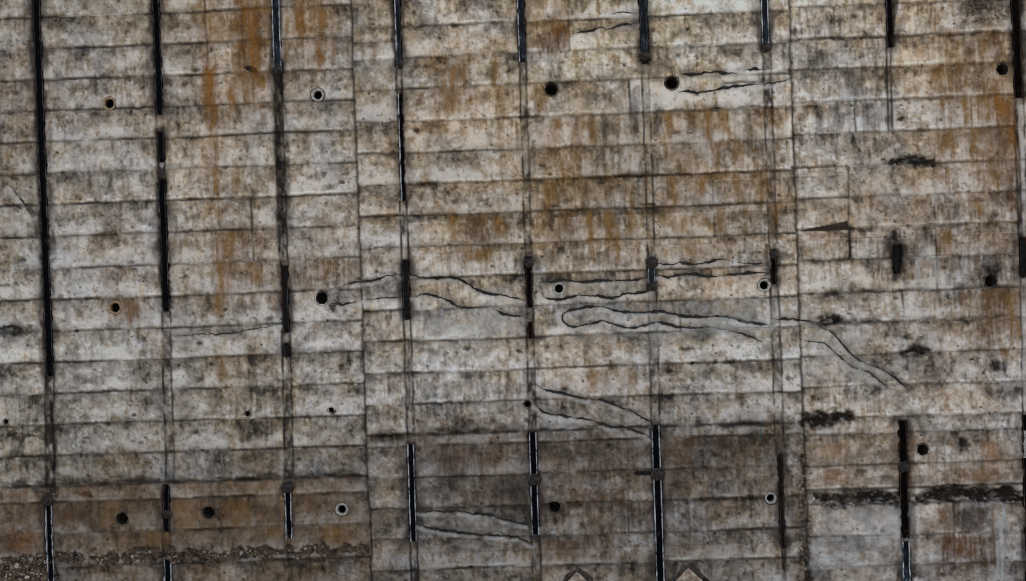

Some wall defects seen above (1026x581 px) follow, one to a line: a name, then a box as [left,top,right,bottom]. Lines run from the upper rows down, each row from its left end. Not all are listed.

corrosion [228,2,270,102]
corrosion [203,67,218,126]
corrosion [935,33,1016,209]
crack [329,259,906,388]
crack [536,386,655,437]
crack [419,509,531,544]
spalling [0,540,369,581]